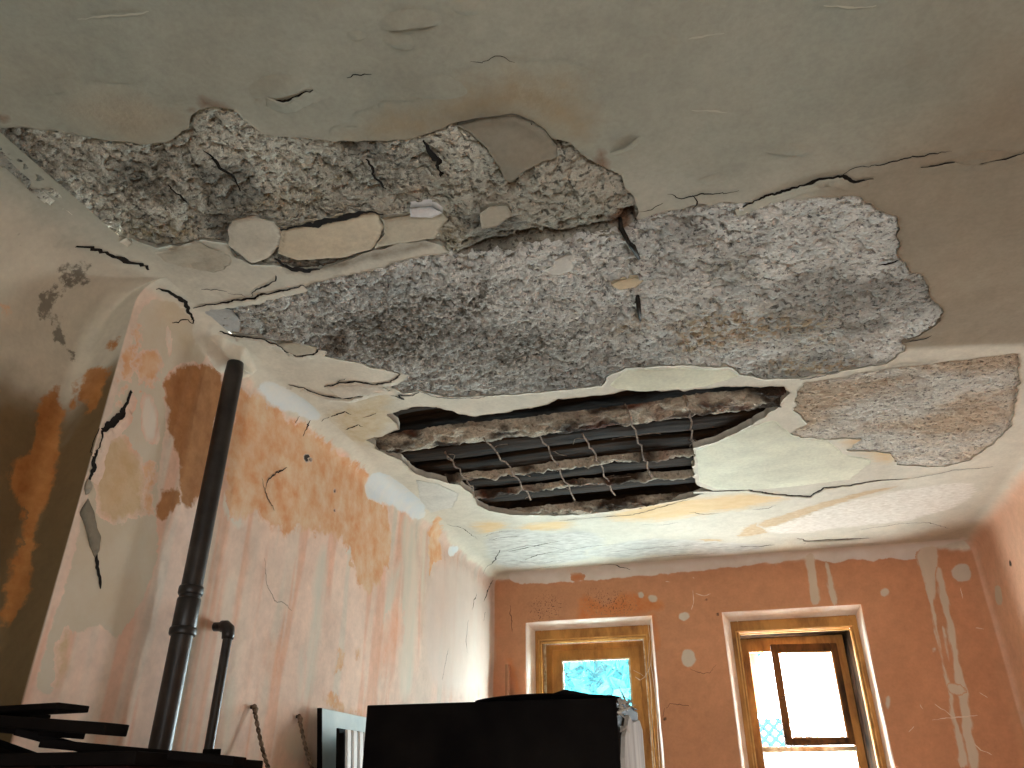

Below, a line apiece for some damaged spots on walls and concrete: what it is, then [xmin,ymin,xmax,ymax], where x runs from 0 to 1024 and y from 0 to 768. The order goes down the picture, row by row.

crack [643,151,1024,217]
crack [76,246,504,436]
spalling [0,107,1020,515]
crack [88,390,138,485]
damp [129,348,223,510]
damp [324,387,399,449]
crack [262,467,287,509]
crack [94,554,102,589]
damp [218,571,237,622]
crack [442,466,993,679]
damp [804,553,838,606]
damp [915,546,980,768]